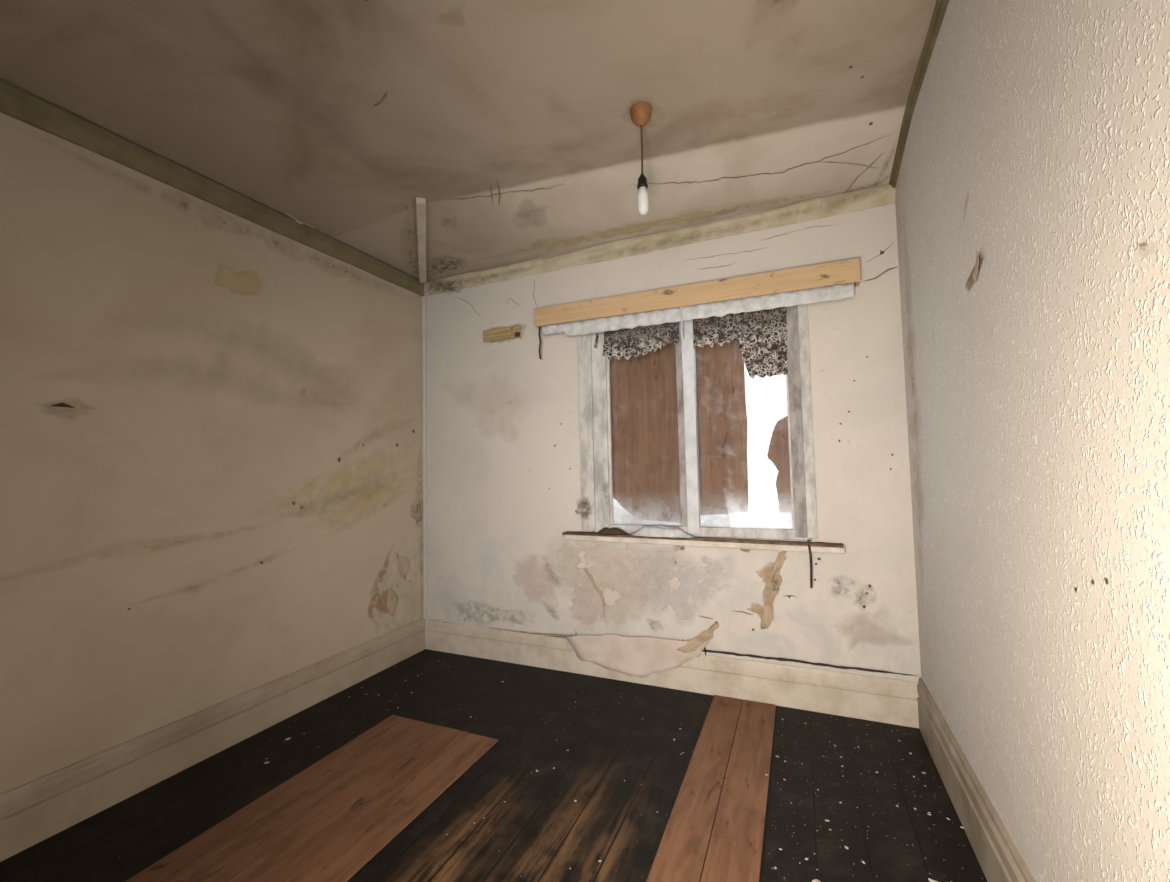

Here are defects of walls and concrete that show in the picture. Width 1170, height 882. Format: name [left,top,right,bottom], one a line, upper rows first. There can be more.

crack [629,132,895,185]
crack [440,180,562,205]
crack [689,225,830,270]
crack [862,240,899,282]
peeling [966,251,982,289]
peeling [759,559,785,603]